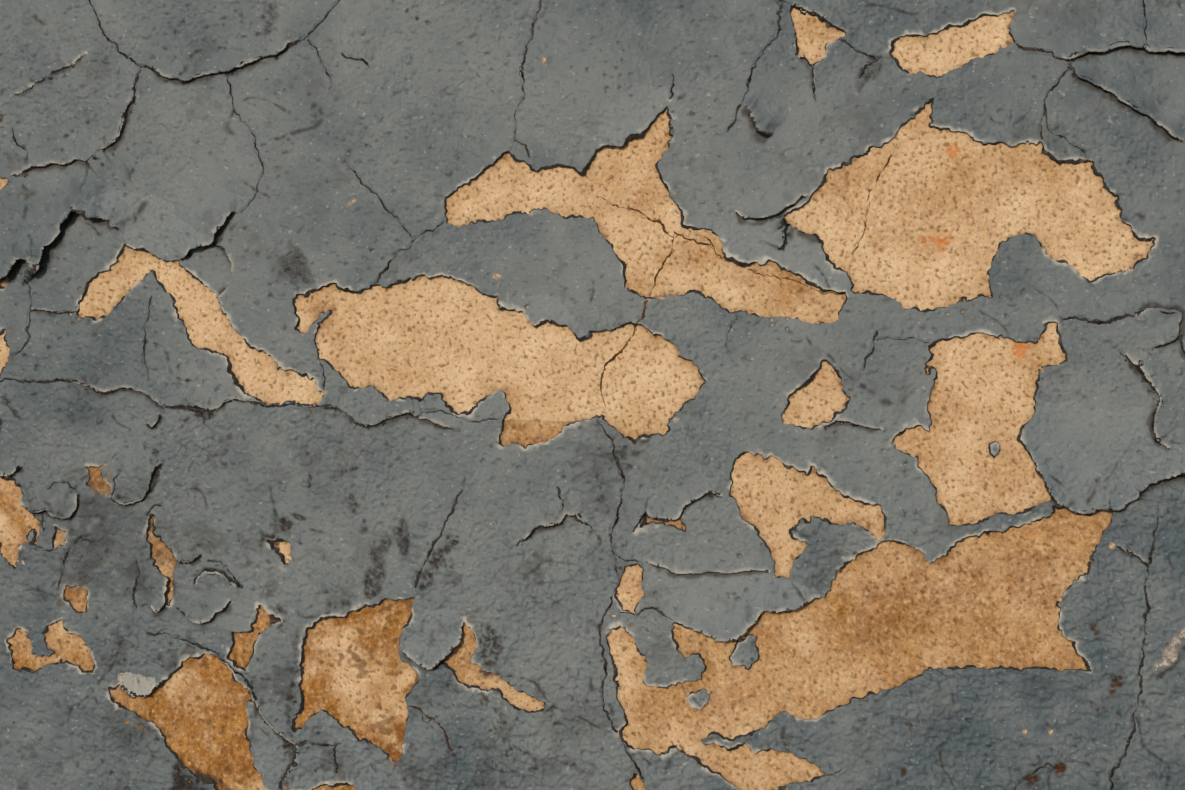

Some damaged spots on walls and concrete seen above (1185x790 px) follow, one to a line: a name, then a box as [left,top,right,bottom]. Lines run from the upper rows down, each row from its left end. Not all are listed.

crack [12,0,369,213]
peeling [69,189,324,405]
crack [0,280,498,432]
peeling [295,275,705,448]
crack [516,144,897,790]
peeling [446,83,1154,330]
peeling [600,323,1185,790]
peeling [891,10,1014,77]
crack [1016,0,1185,158]
crack [1062,310,1185,790]
crack [132,556,340,790]
peeling [110,598,544,790]